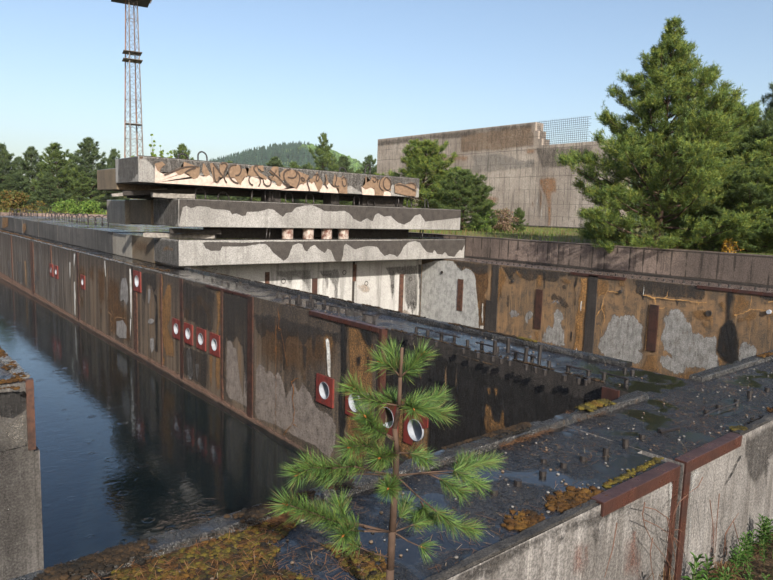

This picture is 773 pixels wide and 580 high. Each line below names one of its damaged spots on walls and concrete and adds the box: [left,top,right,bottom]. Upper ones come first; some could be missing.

corrosion [348,326,372,395]
corrosion [475,270,488,329]
peeling [542,301,565,346]
corrosion [573,278,587,351]
peeling [598,315,643,364]
crack [643,292,707,309]
peeling [660,309,719,375]
damp [717,292,739,364]
peeling [226,340,336,459]
corrosion [485,405,504,433]
damp [746,427,773,484]